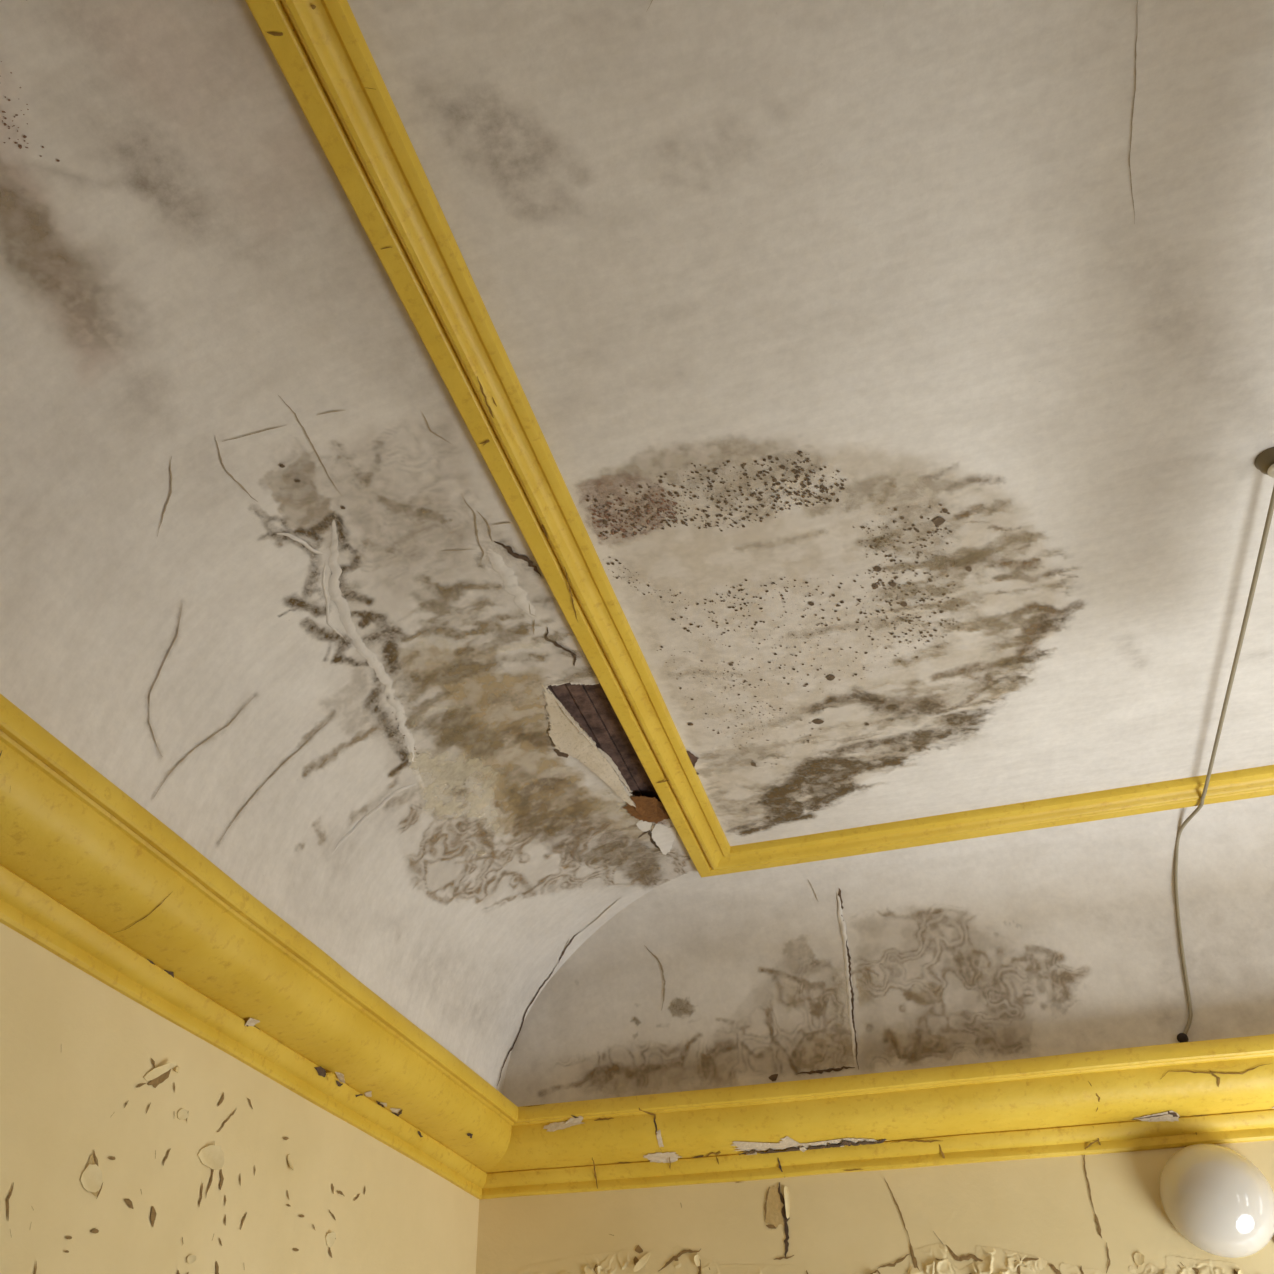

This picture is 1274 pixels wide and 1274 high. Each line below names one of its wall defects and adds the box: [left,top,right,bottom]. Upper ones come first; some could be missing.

damp [2,96,44,157]
damp [586,451,846,539]
damp [387,578,687,902]
flaking render [541,682,676,855]
damp [607,504,1078,835]
crack [498,899,619,1083]
crack [769,880,859,1081]
peeling [112,1058,180,1115]
crack [592,1096,945,1271]
peeling [856,1242,1102,1274]
crack [1084,1138,1110,1273]
peeling [1128,1253,1248,1274]